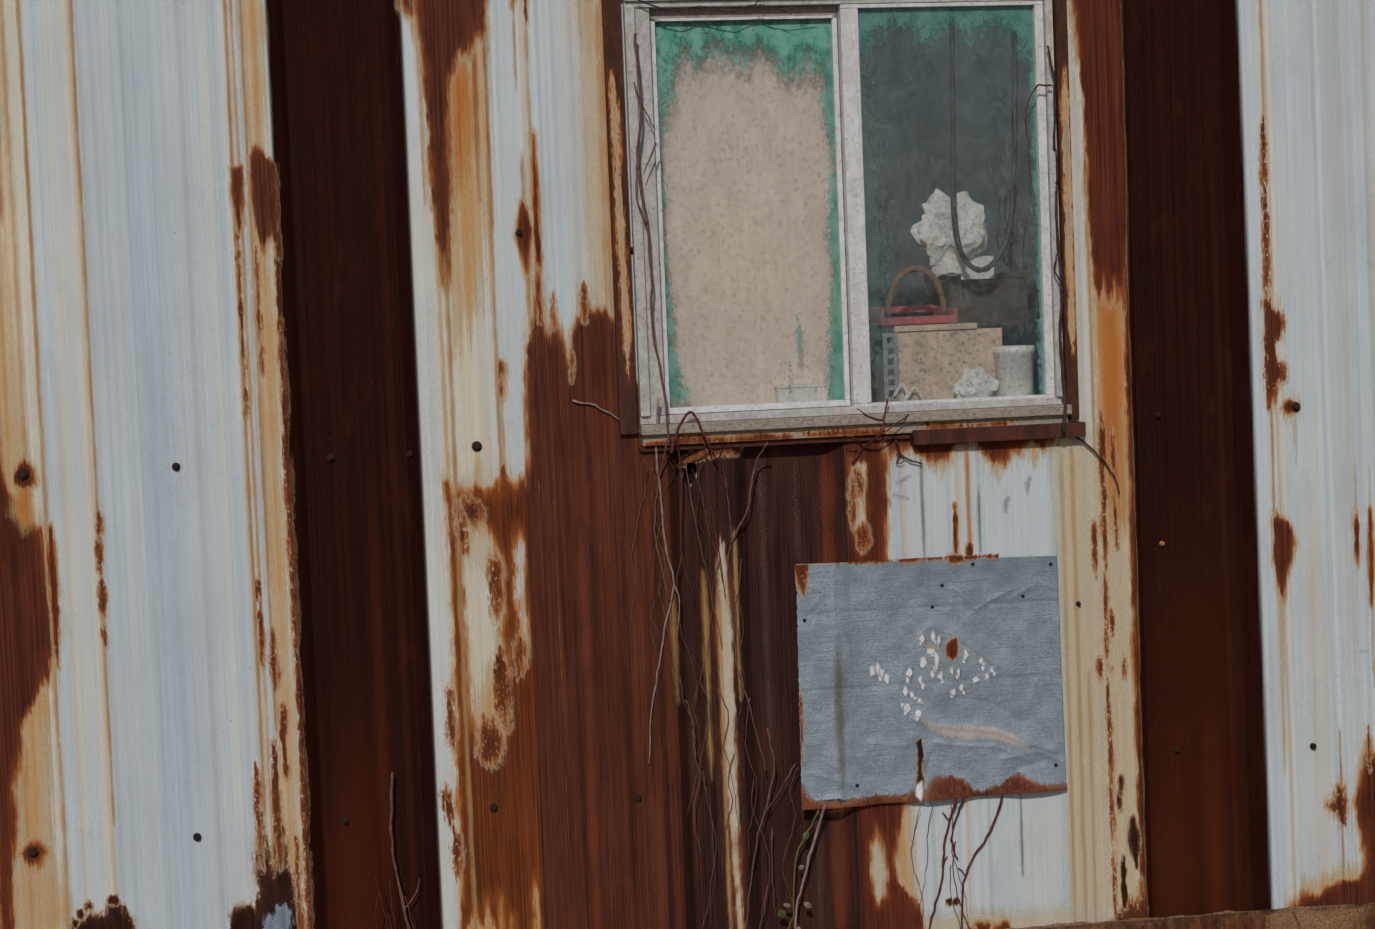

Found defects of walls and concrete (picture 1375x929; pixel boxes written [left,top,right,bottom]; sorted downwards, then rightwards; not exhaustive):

rust [0,0,68,929]
rust [223,0,314,929]
rust [396,0,1191,929]
rust [1259,0,1301,763]
rust [1211,725,1375,929]
rust [1354,505,1375,608]